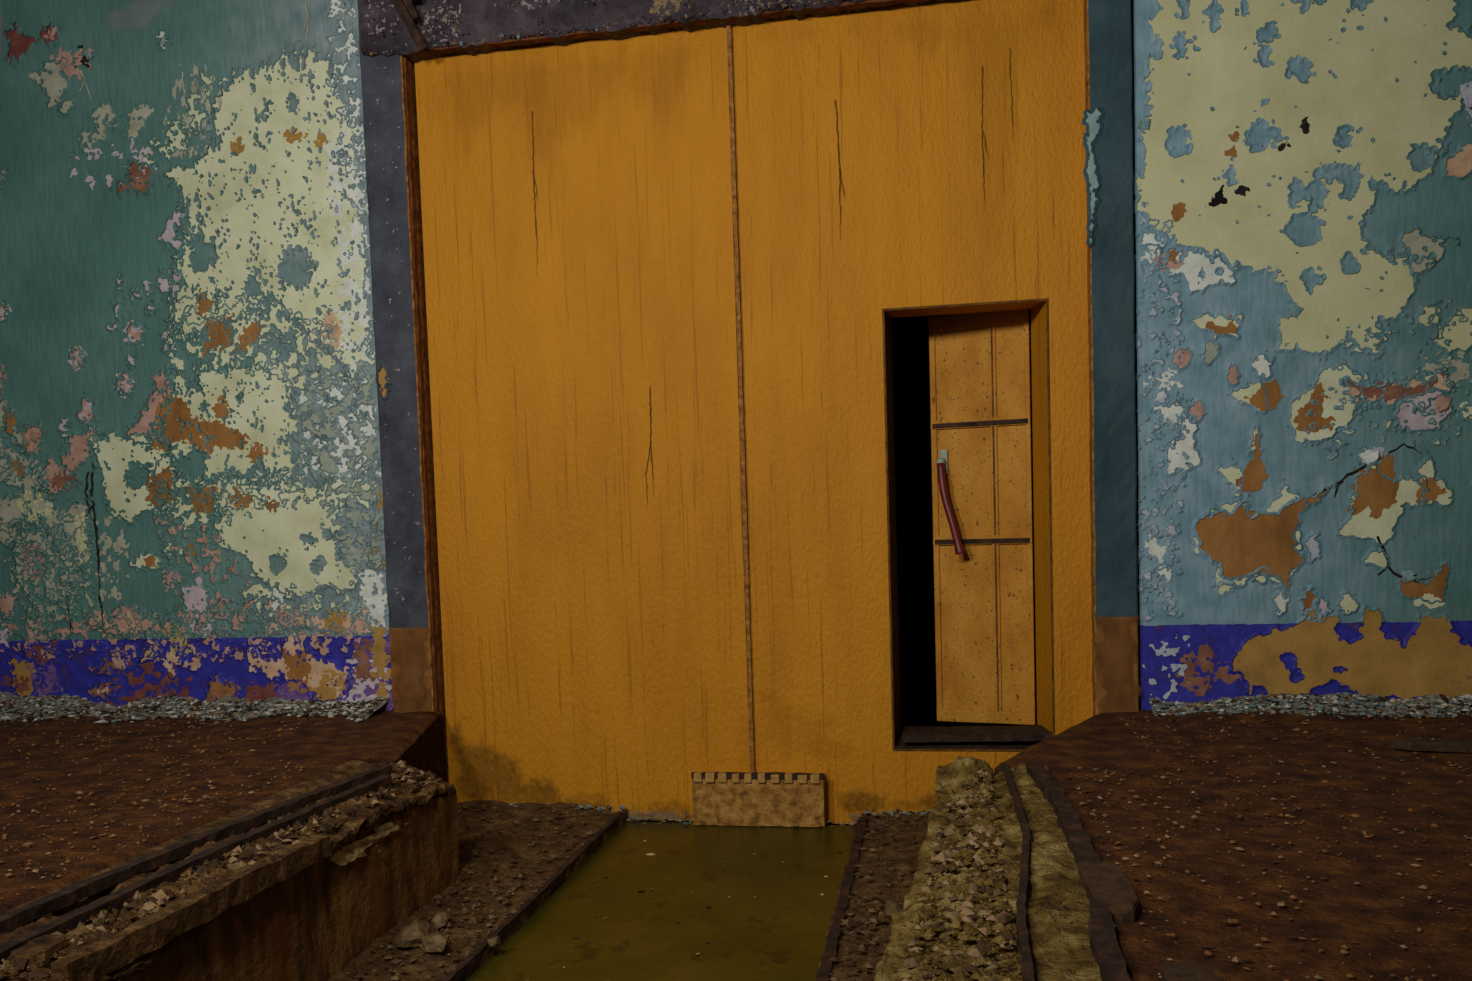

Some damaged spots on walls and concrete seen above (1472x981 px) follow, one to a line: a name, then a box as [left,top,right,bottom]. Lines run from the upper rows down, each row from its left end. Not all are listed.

peeling [0,0,425,711]
peeling [1133,0,1472,699]
crack [1311,443,1422,498]
crack [1376,536,1433,583]